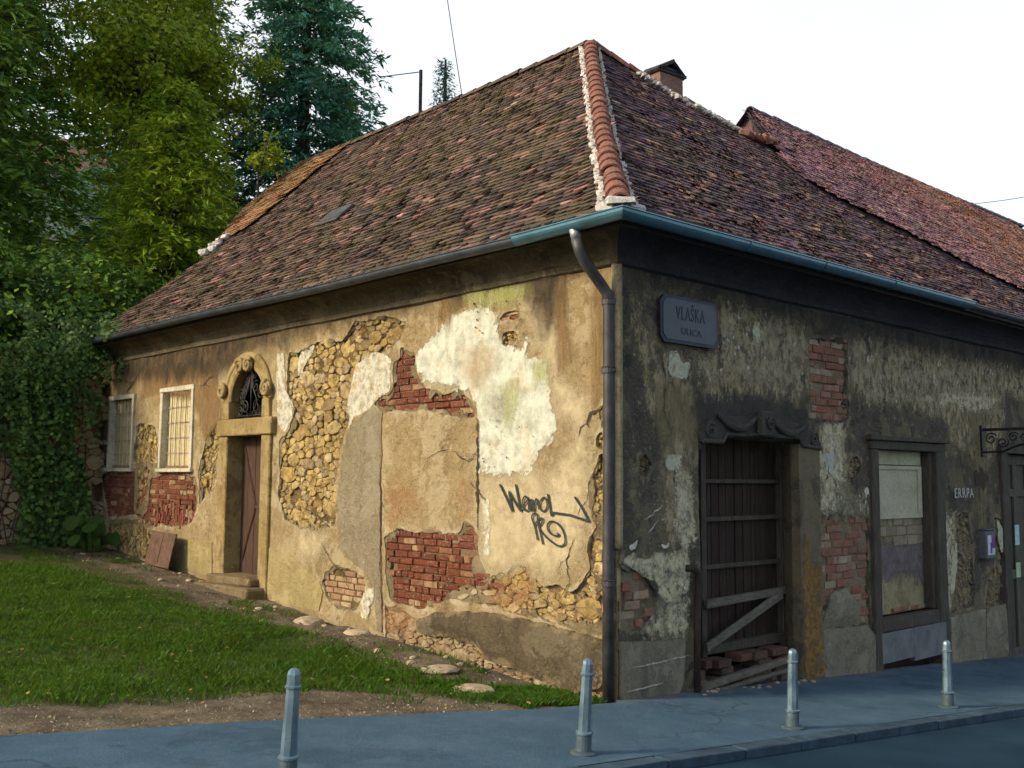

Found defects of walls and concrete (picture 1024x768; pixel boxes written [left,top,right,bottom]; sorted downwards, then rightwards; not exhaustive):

flaking render [102,418,222,559]
crack [579,406,601,434]
peeling [276,296,1024,687]
water stain [881,537,924,584]